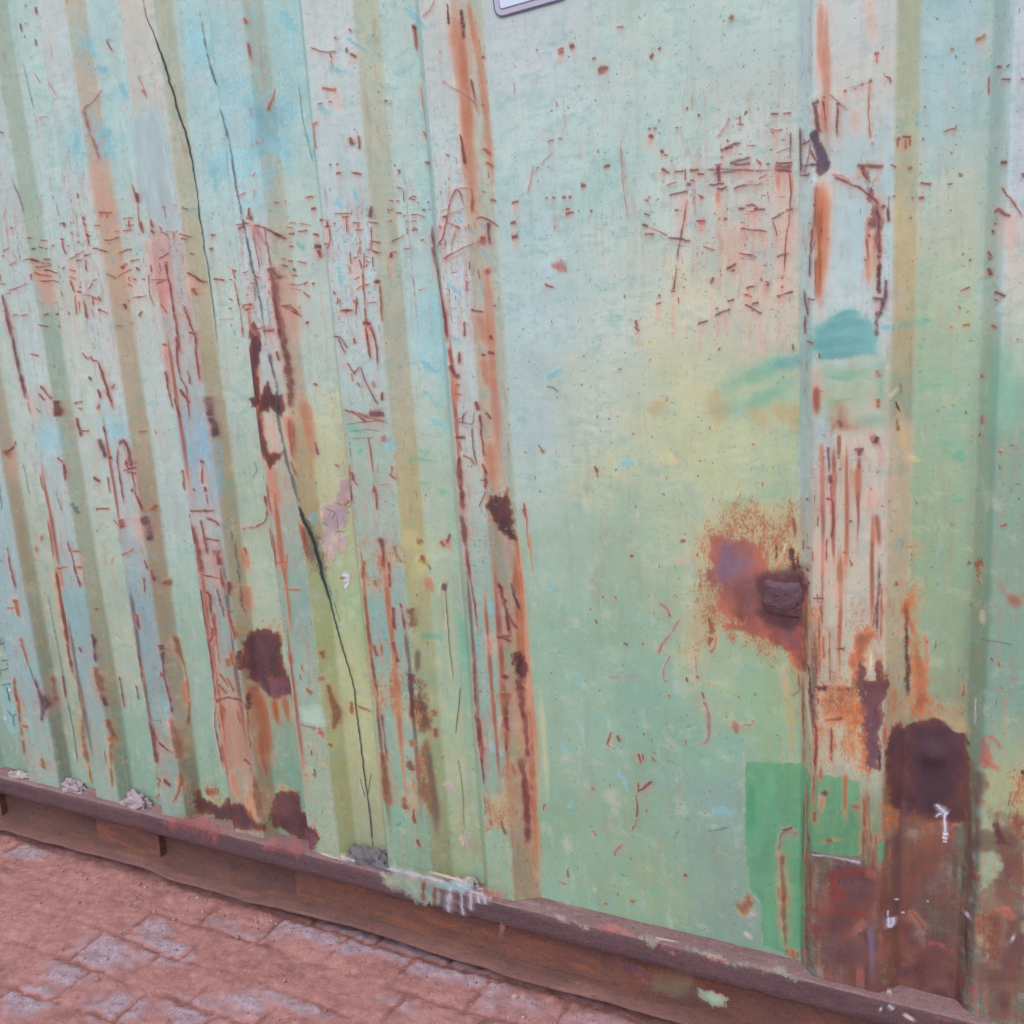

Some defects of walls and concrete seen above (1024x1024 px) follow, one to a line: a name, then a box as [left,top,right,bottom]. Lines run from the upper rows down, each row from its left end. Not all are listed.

rust [411,0,465,50]
rust [93,425,158,541]
rust [132,185,168,236]
crack [144,8,217,338]
rust [132,253,342,850]
rust [232,192,299,477]
crack [202,24,373,845]
rust [432,234,546,846]
rust [804,387,819,412]
rust [799,79,874,358]
rust [991,188,1021,234]
rust [658,415,1024,1010]